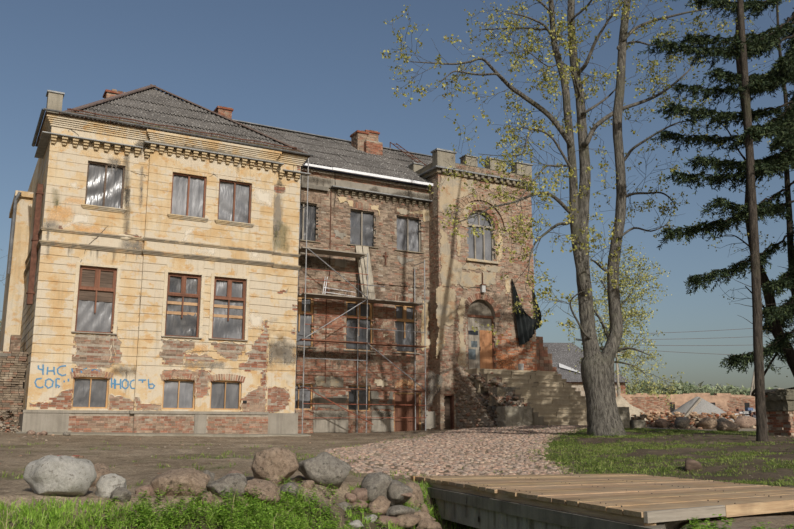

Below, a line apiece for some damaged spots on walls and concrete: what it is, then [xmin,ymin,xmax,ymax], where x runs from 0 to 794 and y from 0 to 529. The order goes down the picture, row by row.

leakage [274,181,287,247]
flaking render [396,208,429,222]
flaking render [420,175,511,367]
spalling [72,325,122,377]
spalling [159,314,290,413]
spalling [29,389,73,409]